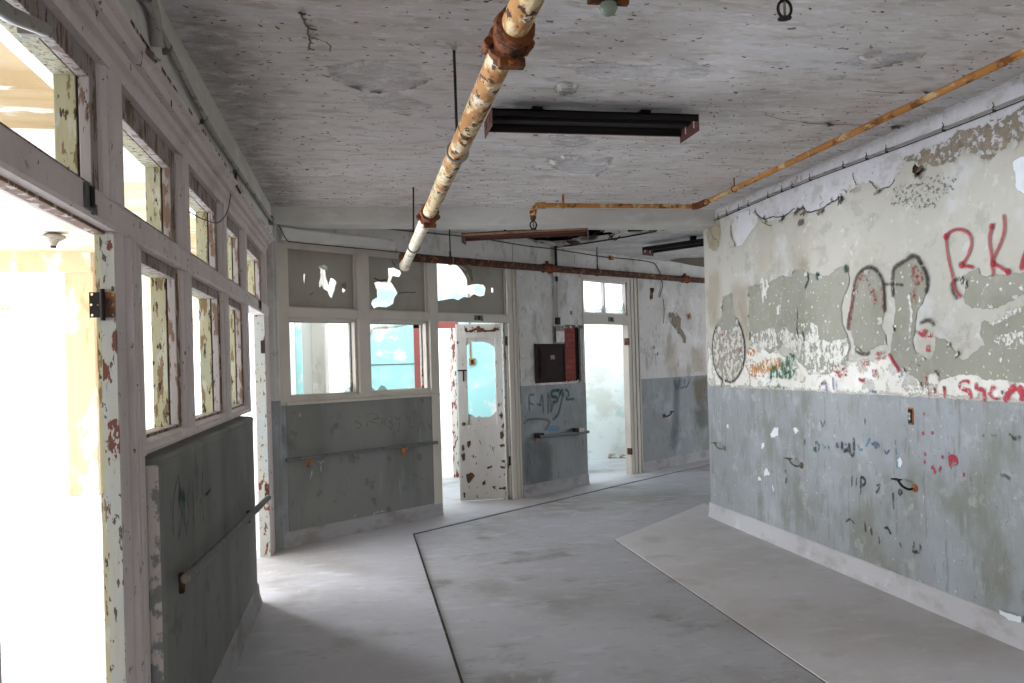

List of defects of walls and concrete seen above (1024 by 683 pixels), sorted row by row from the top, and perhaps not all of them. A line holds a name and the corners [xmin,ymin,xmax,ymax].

crack [298,11,331,52]
peeling [232,15,453,205]
flaking render [666,0,1024,251]
flaking render [669,312,686,343]
peeling [707,254,1024,401]
peeling [463,460,506,498]